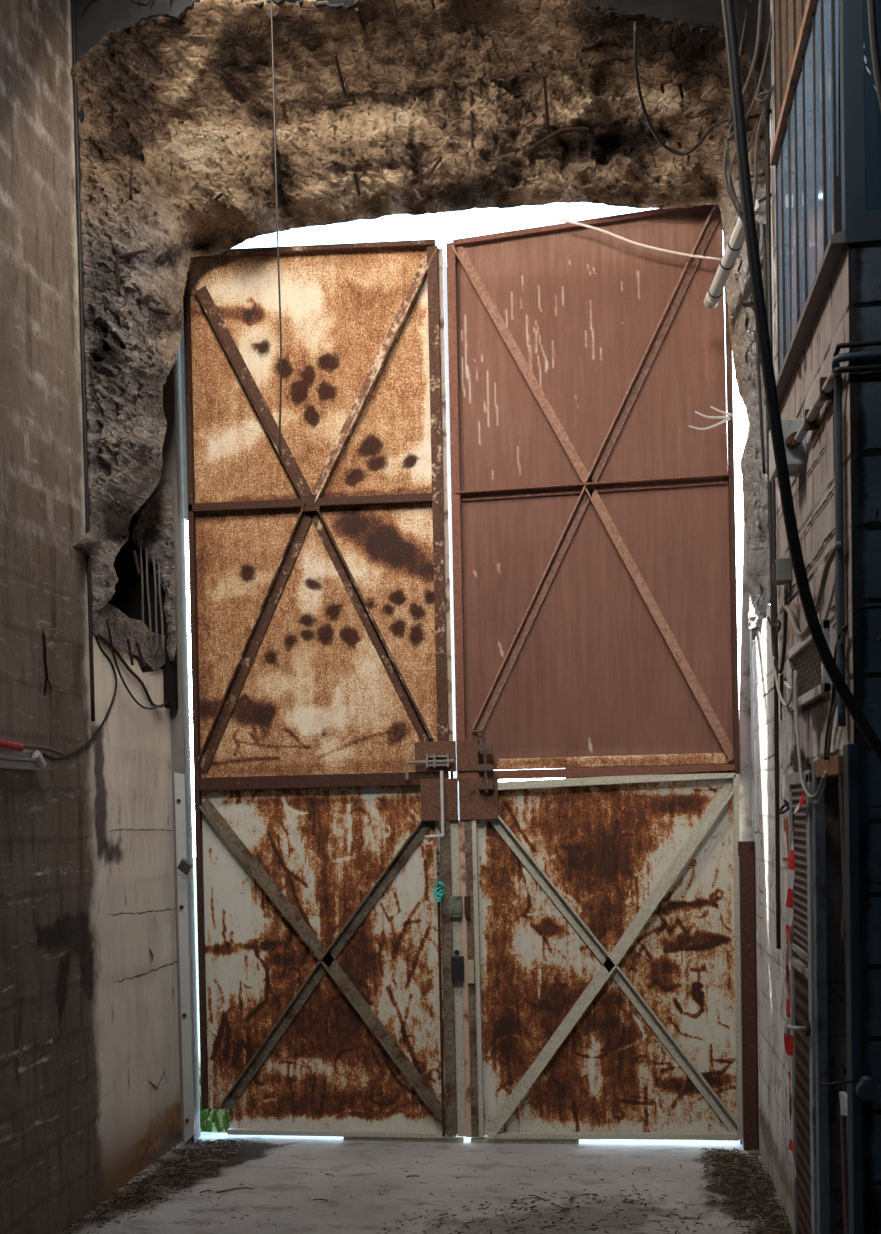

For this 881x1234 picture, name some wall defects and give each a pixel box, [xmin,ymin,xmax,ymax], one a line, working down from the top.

spalling [70,0,772,709]